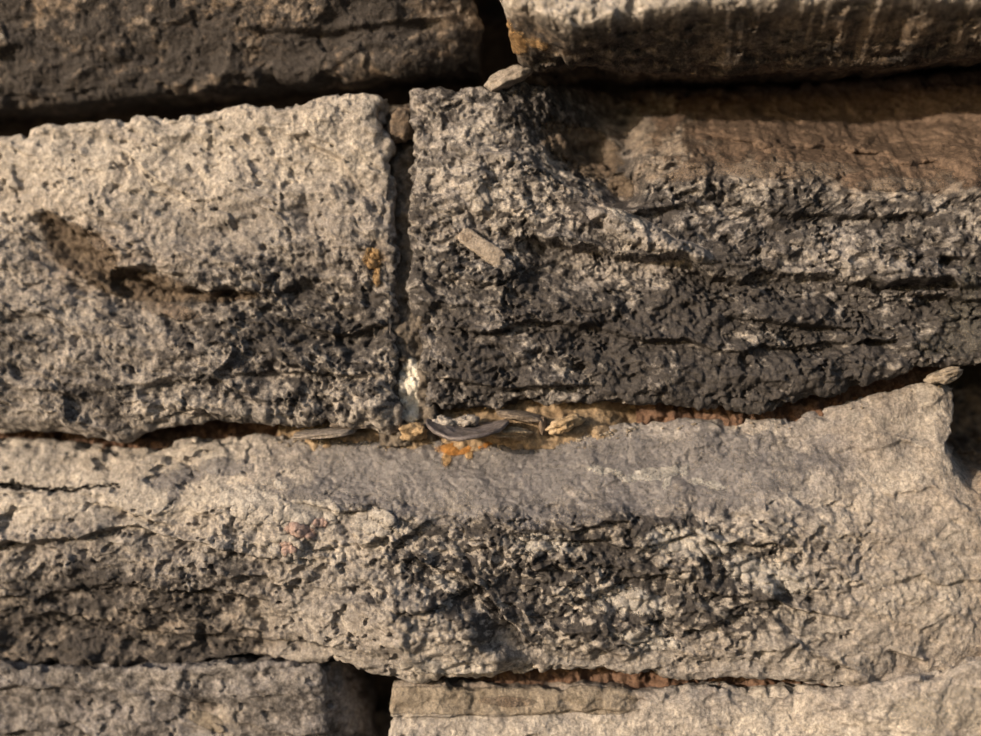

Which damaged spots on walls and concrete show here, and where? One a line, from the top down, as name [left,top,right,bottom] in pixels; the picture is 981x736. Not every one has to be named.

crack [0,482,119,493]